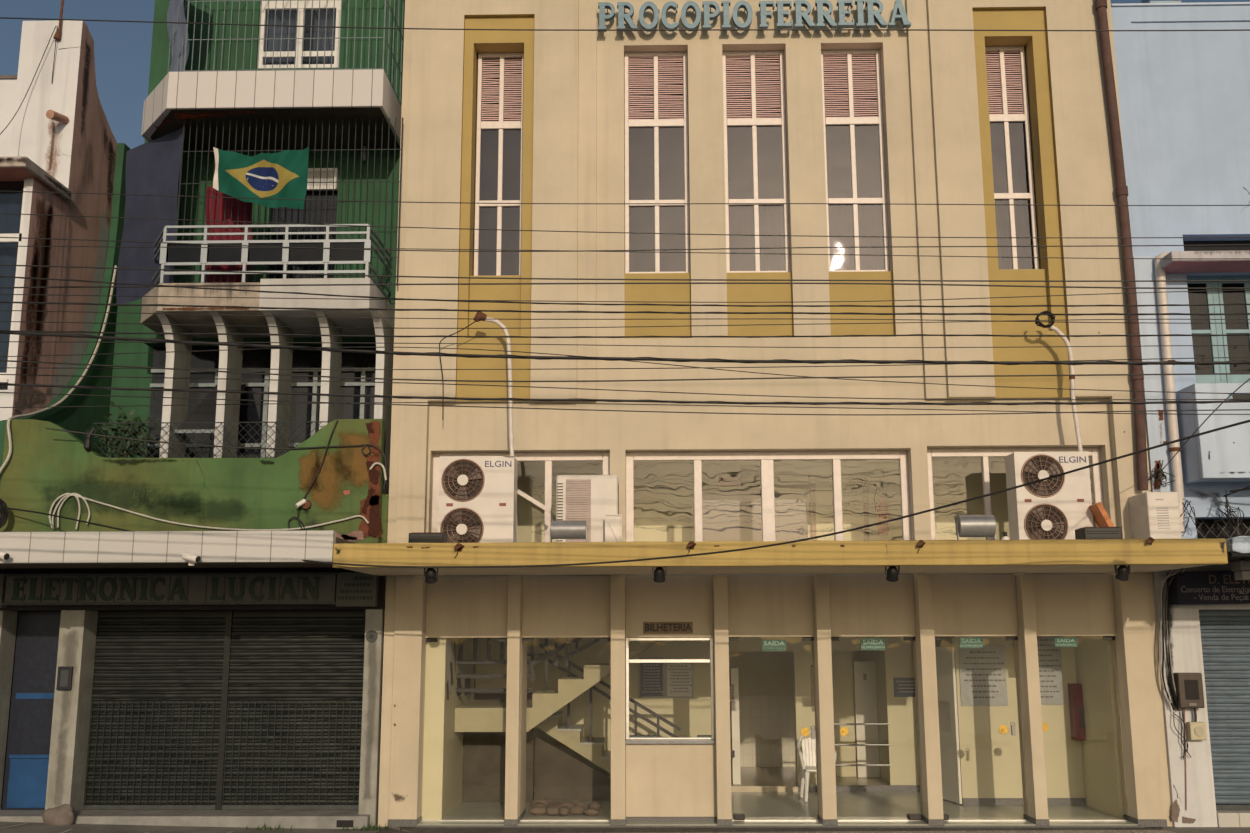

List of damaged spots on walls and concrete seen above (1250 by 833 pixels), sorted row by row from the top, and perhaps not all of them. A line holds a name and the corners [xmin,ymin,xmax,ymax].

water stain [81,42,90,132]
water stain [104,131,115,221]
water stain [20,200,53,390]
water stain [46,480,242,520]
peeling [300,421,382,542]